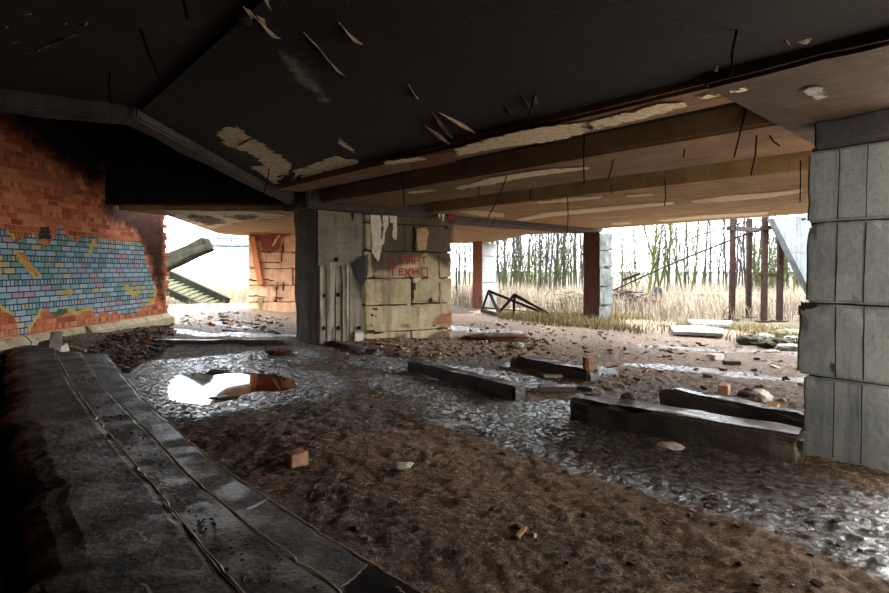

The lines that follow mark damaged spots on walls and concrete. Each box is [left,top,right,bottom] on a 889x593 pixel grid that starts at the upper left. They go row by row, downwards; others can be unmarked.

peeling [217,127,359,184]
peeling [384,157,426,205]
peeling [424,102,687,184]